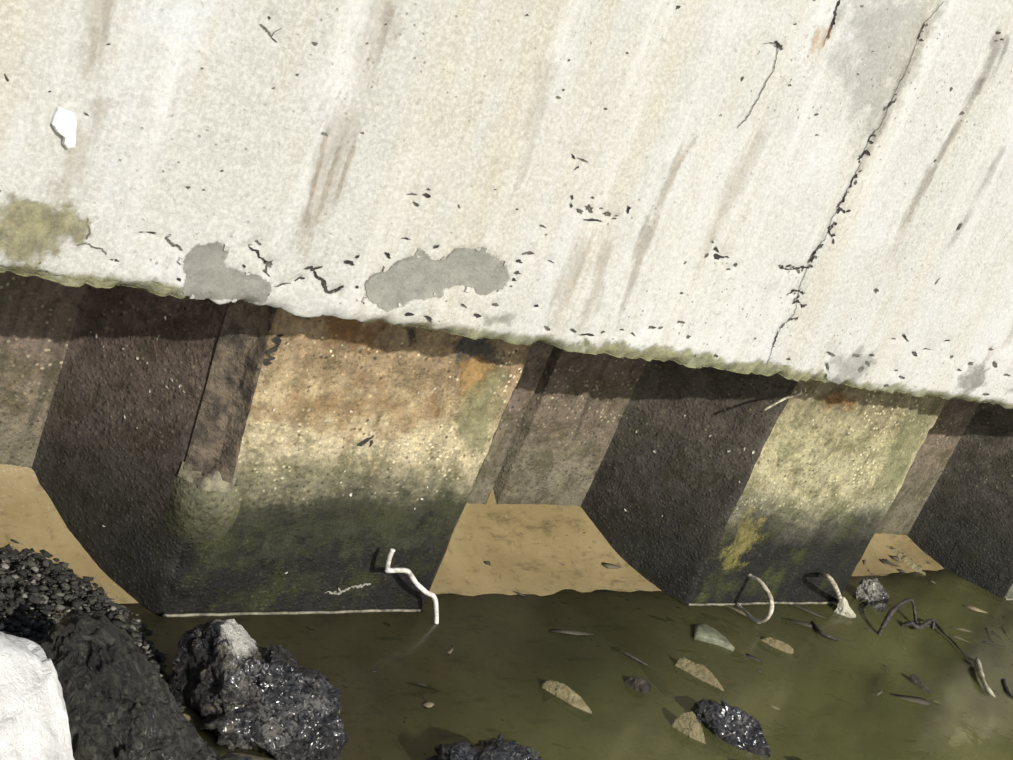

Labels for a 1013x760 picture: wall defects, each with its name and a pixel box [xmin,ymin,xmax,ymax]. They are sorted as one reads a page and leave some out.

crack [737,40,783,128]
crack [767,0,944,364]
crack [248,244,344,294]
peeling [362,247,510,312]
spalling [177,241,276,492]
leakage [325,583,371,595]